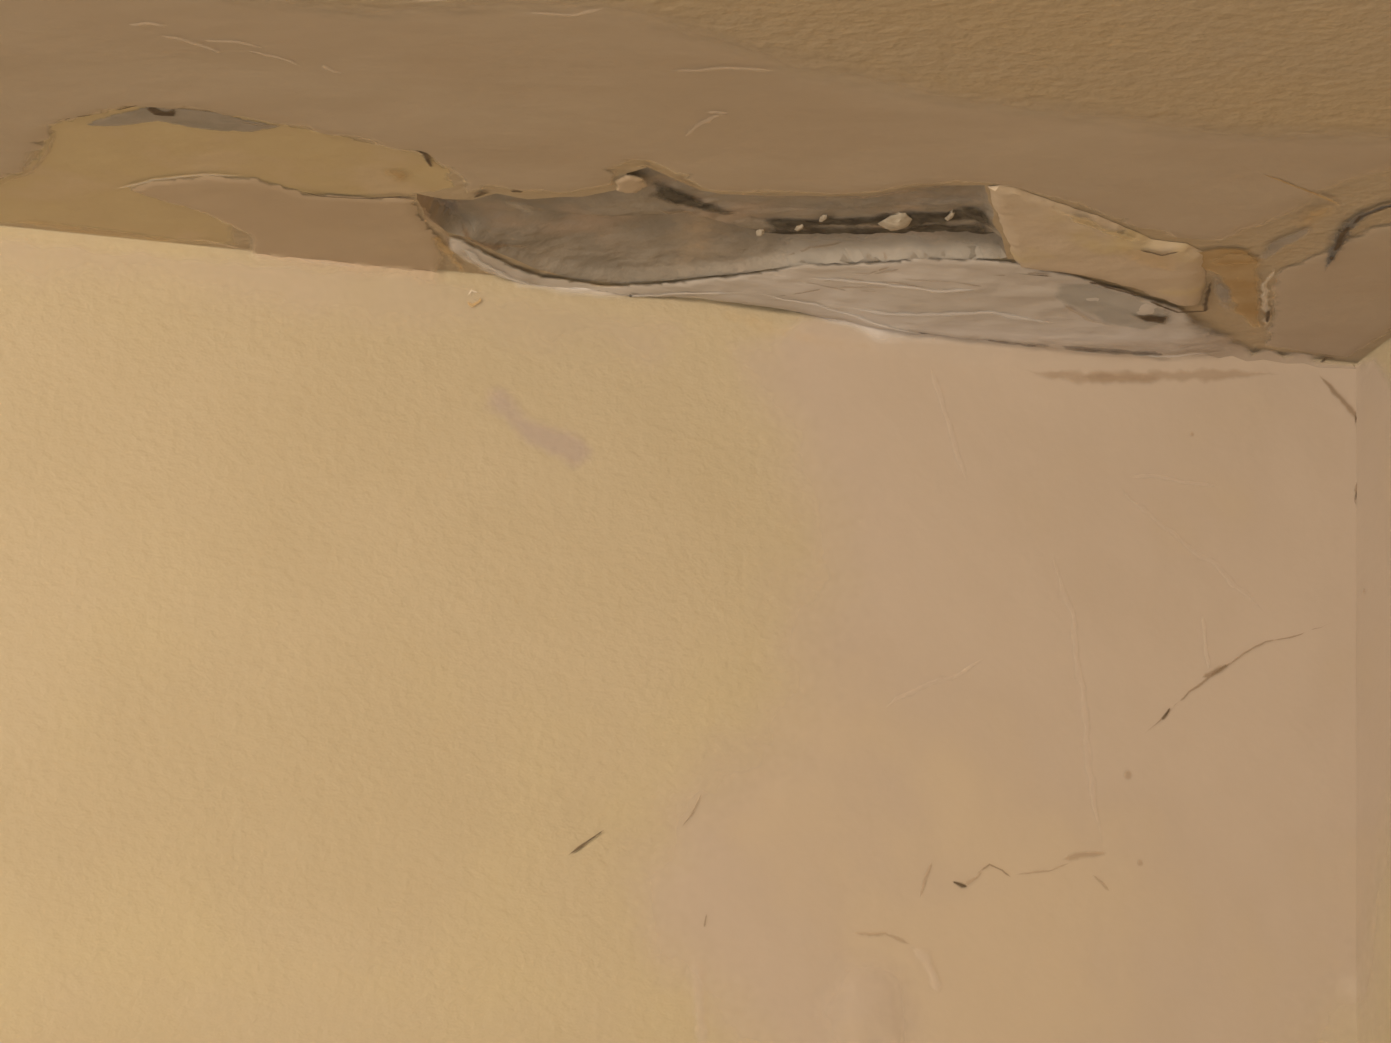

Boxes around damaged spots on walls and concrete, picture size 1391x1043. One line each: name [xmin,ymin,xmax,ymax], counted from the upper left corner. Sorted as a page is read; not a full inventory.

spalling [0,106,1008,283]
spalling [1059,286,1169,329]
crack [1155,627,1321,725]